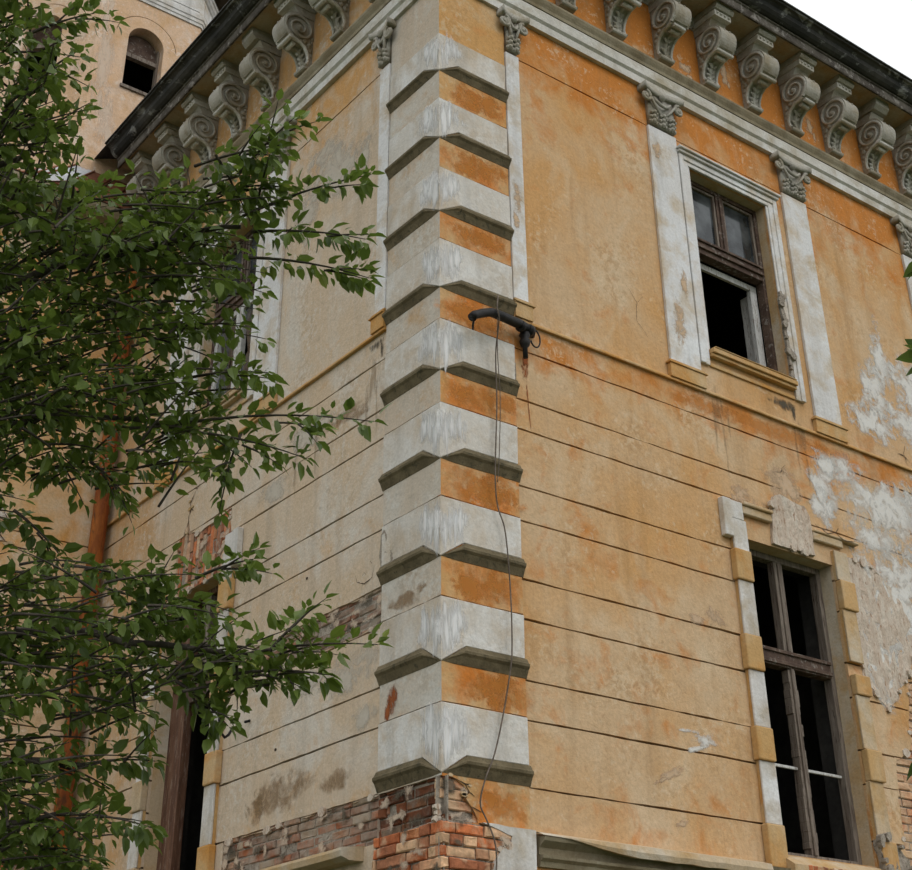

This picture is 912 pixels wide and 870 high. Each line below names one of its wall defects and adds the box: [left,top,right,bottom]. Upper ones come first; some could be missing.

crack [0,512,36,558]
spalling [177,506,232,596]
spalling [246,587,382,670]
flaking render [731,449,912,870]
spalling [221,775,514,870]